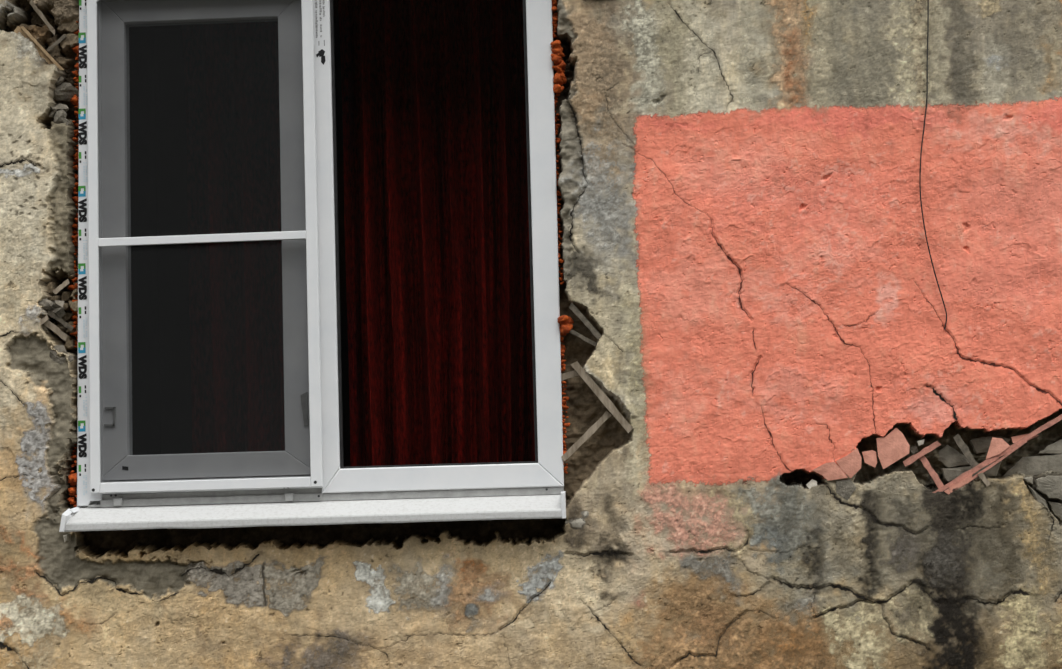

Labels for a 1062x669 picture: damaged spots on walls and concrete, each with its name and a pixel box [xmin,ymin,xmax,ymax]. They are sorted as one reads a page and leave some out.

peeling [623,0,664,108]
spalling [0,0,79,406]
peeling [15,401,88,508]
spalling [552,0,634,529]
crack [605,84,791,471]
crack [926,386,958,424]
crack [914,281,1062,406]
crack [36,554,260,625]
crack [674,531,1030,663]
spalling [643,409,1062,669]
damp [859,493,911,599]
damp [912,476,992,669]